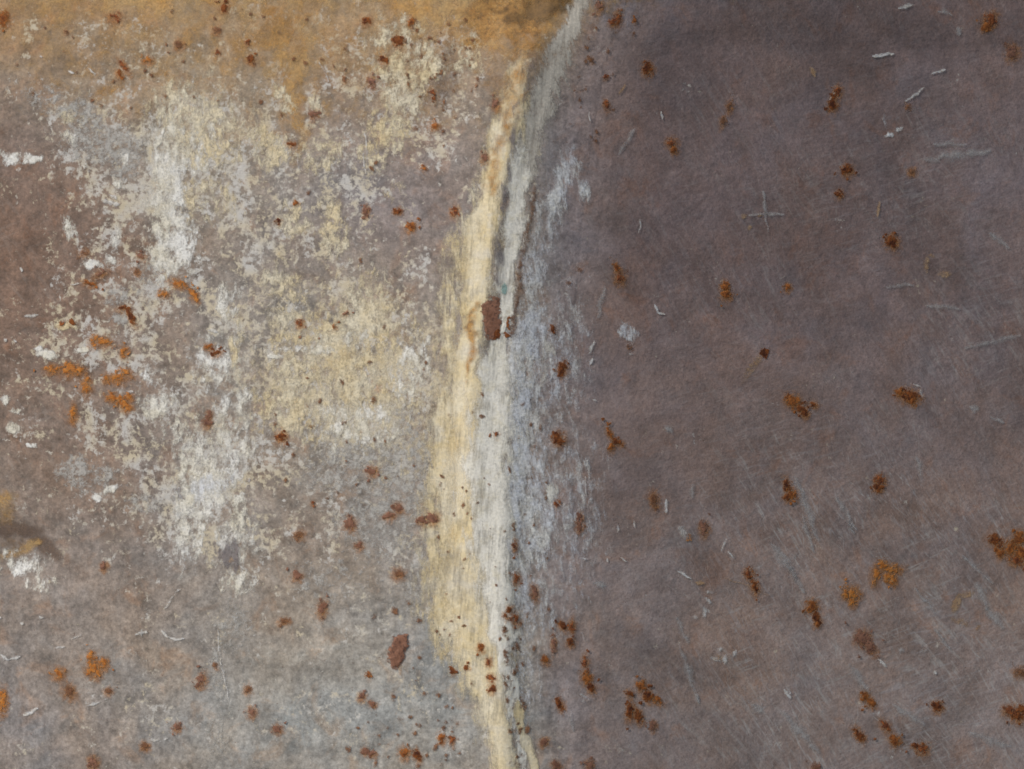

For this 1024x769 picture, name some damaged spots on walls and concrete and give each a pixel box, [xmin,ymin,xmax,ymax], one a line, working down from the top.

corrosion [391,18,414,47]
peeling [357,13,480,171]
peeling [26,78,349,325]
corrosion [158,276,199,303]
peeling [35,345,55,360]
corrosion [33,334,134,413]
peeling [2,395,21,434]
peeling [54,454,119,502]
peeling [132,214,469,699]
corrosion [387,634,409,670]
corrosion [623,675,662,730]
corrosion [852,720,928,755]